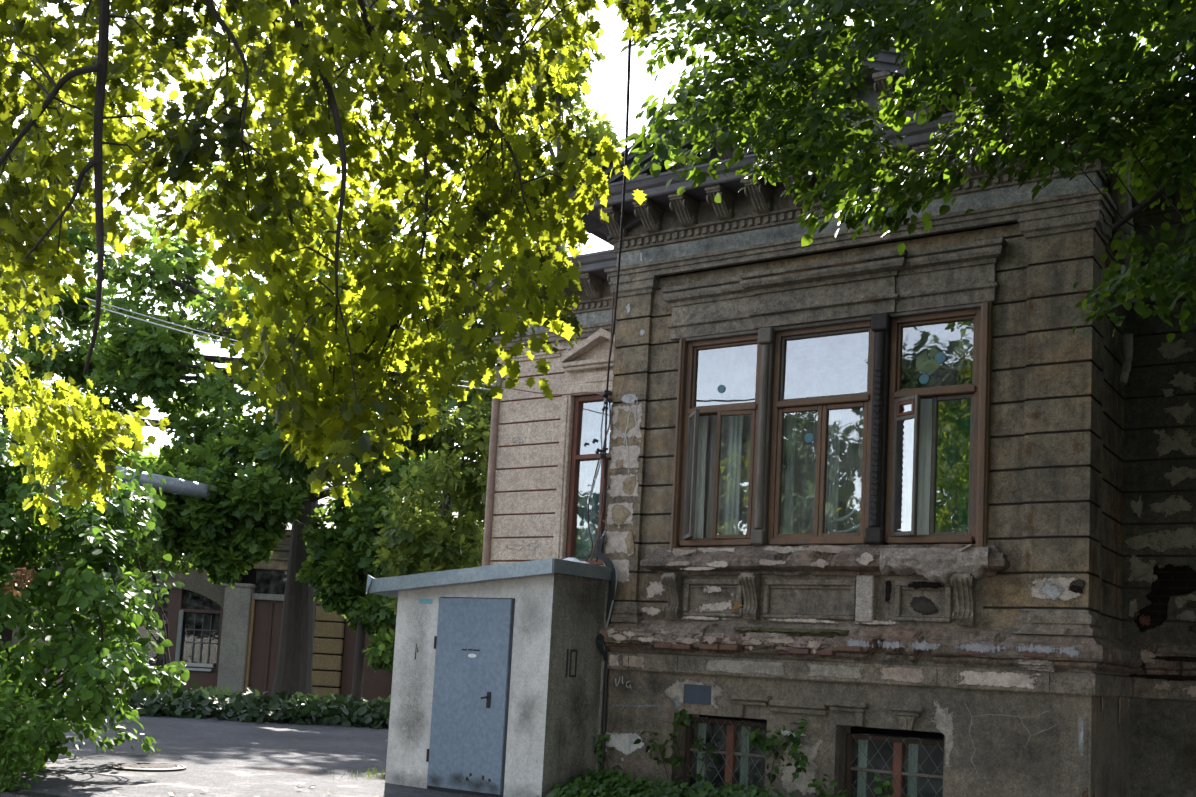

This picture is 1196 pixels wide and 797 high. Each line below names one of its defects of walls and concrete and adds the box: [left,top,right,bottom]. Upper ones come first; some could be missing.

peeling [603,393,643,583]
peeling [1123,337,1196,632]
peeling [665,547,735,571]
peeling [756,545,874,568]
peeling [1029,576,1086,601]
peeling [606,581,1085,710]
spalling [1129,649,1196,698]
peeling [605,731,651,761]
peeling [931,698,955,771]
crack [965,672,1059,772]